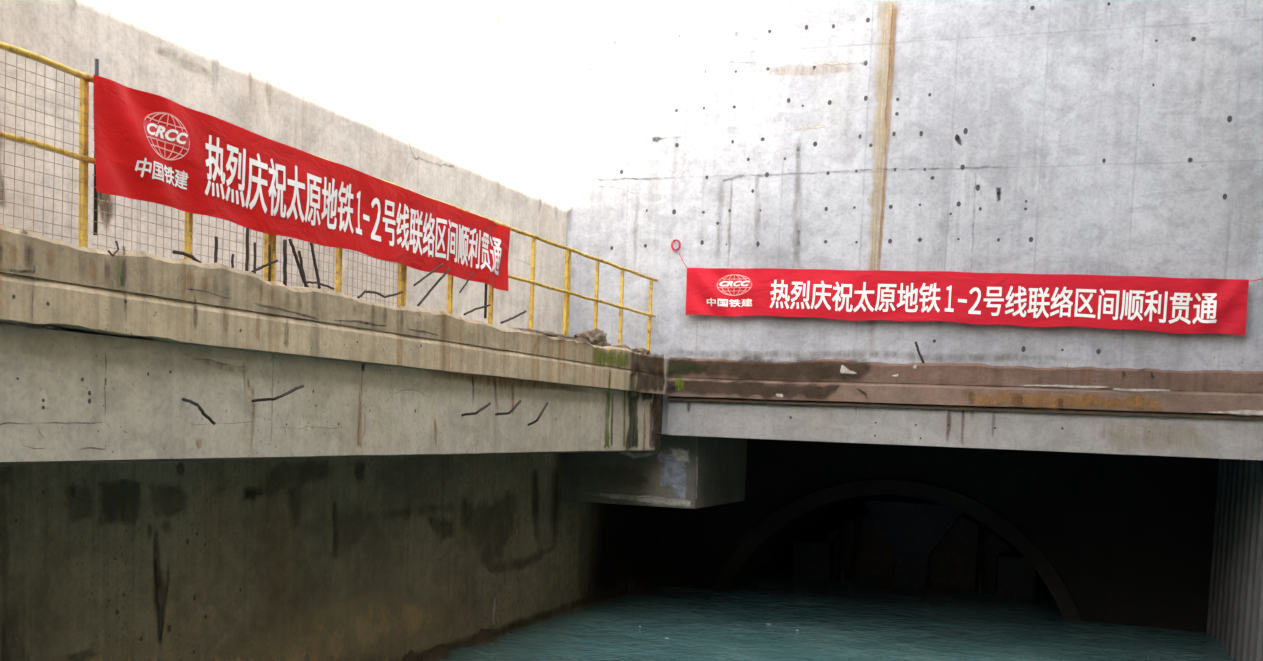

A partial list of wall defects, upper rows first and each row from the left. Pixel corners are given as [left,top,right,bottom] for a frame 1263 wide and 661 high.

corrosion [870,3,896,270]
water stain [148,486,185,643]
water stain [490,503,659,637]